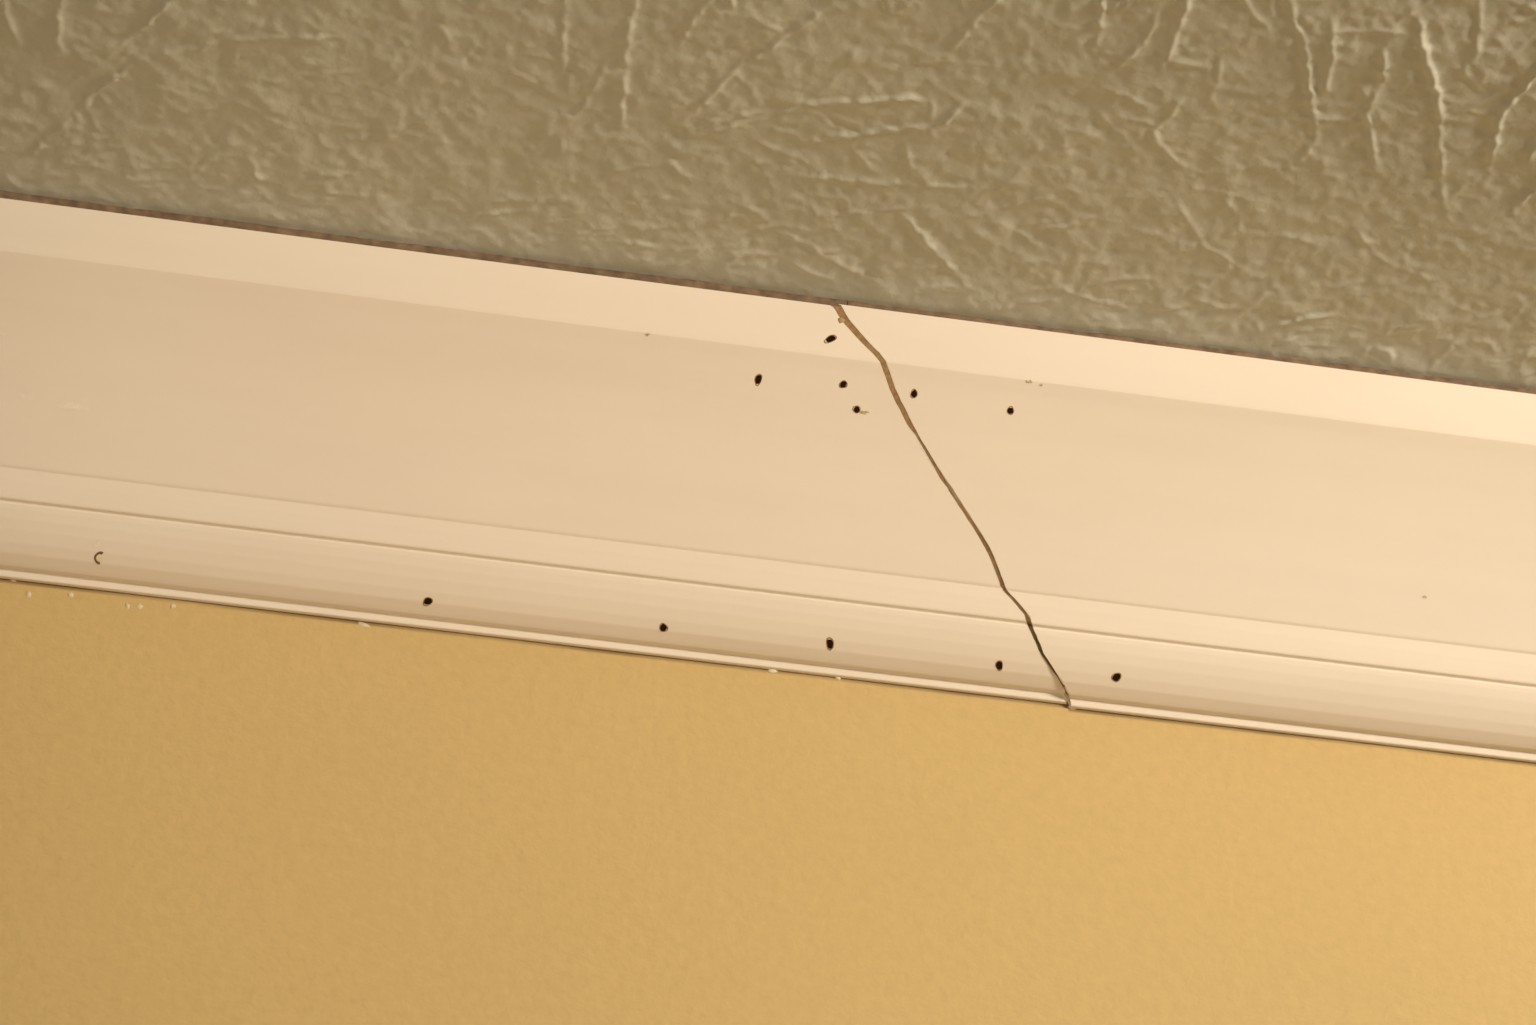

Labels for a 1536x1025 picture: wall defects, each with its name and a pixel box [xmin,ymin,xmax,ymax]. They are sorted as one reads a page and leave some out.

crack [833,305,1069,704]